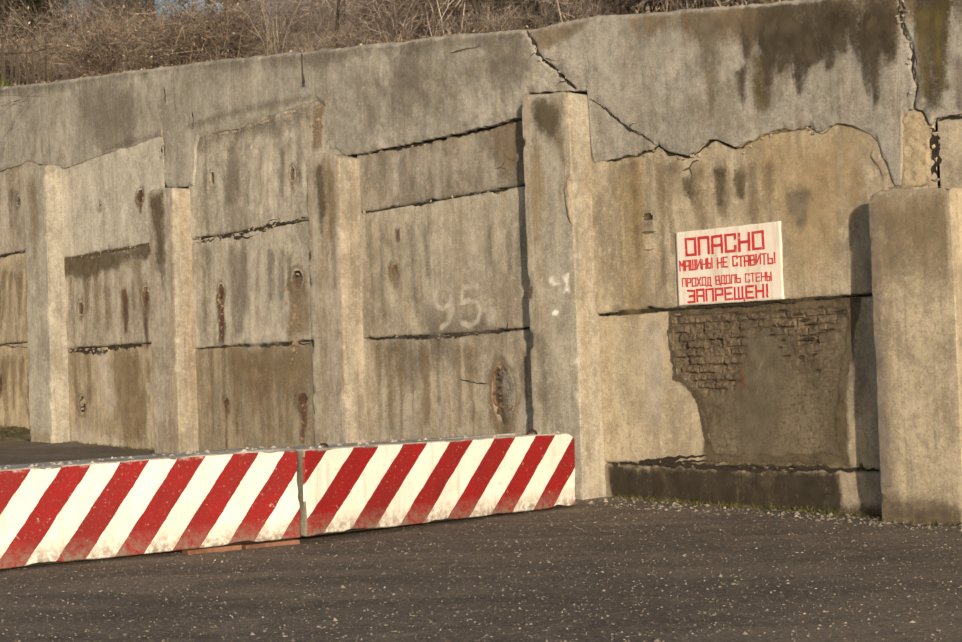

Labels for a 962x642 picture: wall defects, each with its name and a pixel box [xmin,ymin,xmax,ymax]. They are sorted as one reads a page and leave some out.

crack [527,30,845,181]
damp [698,0,897,109]
crack [895,0,918,108]
damp [915,0,962,108]
crack [929,115,962,182]
spalling [282,260,310,364]
flaking render [667,297,861,465]